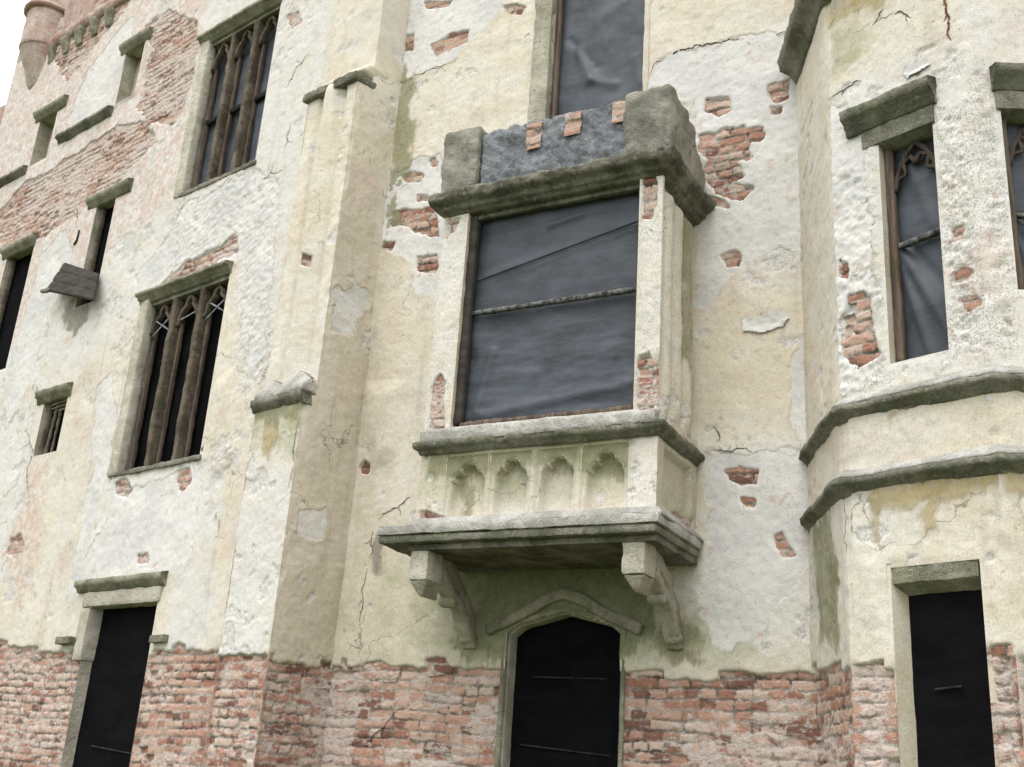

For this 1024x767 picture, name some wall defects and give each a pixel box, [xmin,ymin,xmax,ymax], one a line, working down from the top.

flaking render [402,0,525,80]
crack [943,0,951,41]
flaking render [0,0,201,421]
flaking render [382,154,460,300]
flaking render [648,31,801,308]
flaking render [830,104,881,396]
flaking render [955,268,984,312]
flaking render [429,374,446,430]
flaking render [637,356,659,411]
crack [357,497,409,622]
flaking render [697,339,809,651]
damp [813,512,839,645]